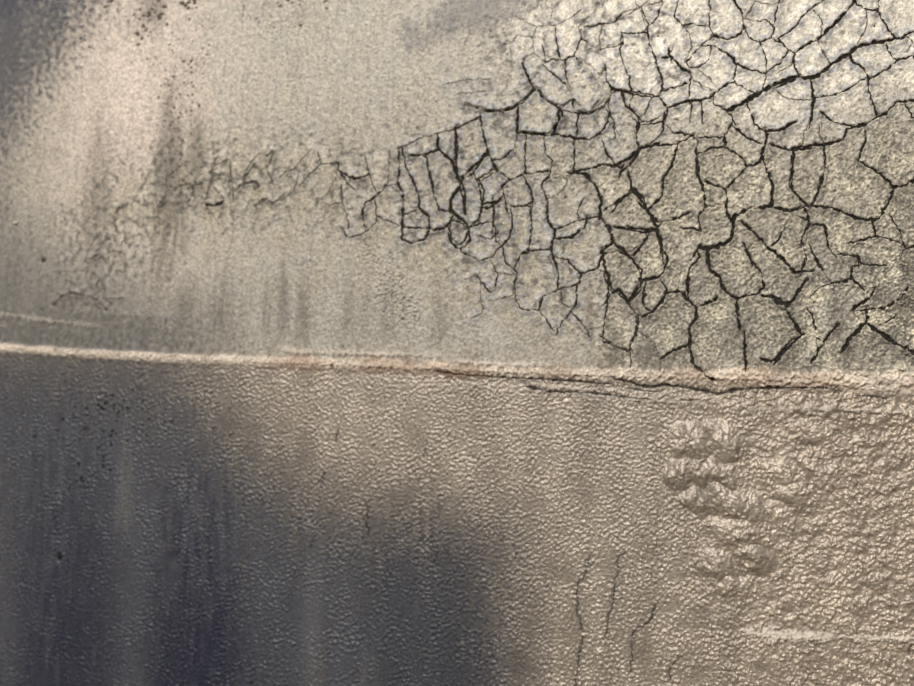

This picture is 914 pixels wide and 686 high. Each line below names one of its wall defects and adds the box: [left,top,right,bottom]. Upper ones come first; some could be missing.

damp [0,0,118,154]
crack [55,0,914,402]
damp [0,343,515,686]